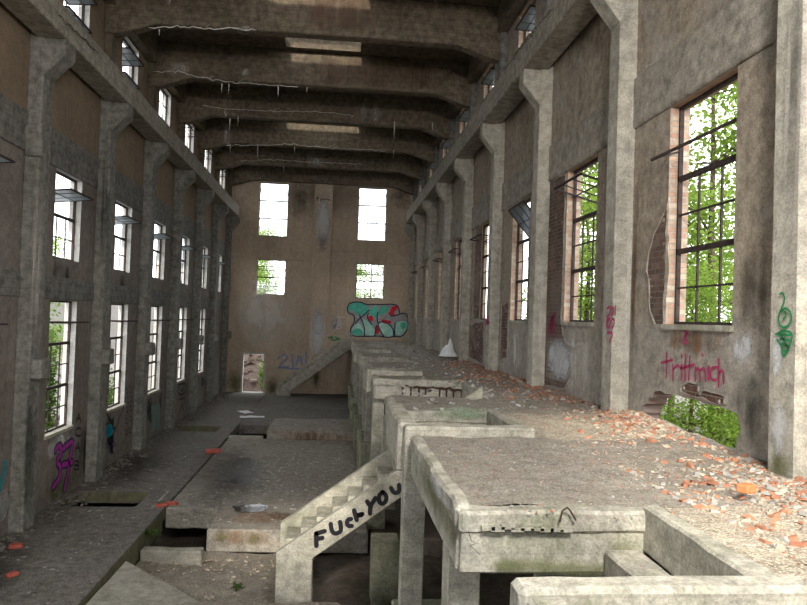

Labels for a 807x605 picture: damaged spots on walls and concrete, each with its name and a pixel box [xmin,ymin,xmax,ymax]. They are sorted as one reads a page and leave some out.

flaking render [645,201,669,331]
flaking render [679,380,729,406]